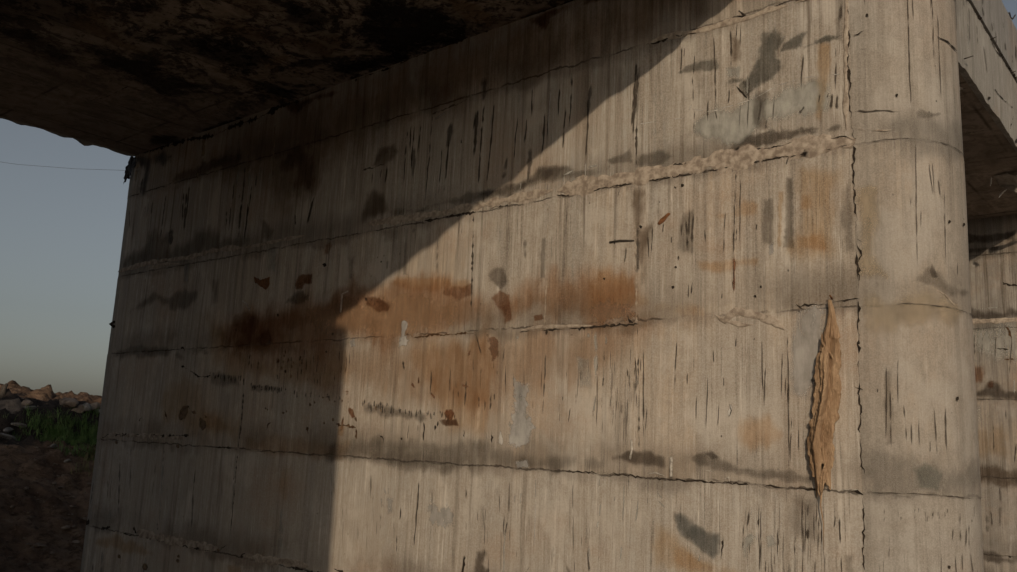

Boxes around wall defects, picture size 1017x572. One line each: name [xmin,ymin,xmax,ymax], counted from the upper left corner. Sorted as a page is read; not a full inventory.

leakage [404,113,462,197]
leakage [473,80,494,182]
leakage [520,75,573,189]
leakage [563,87,596,181]
leakage [631,65,651,132]
crack [967,0,1017,127]
crack [594,7,907,570]
crack [337,419,439,442]
crack [537,469,816,498]
crack [86,519,245,558]